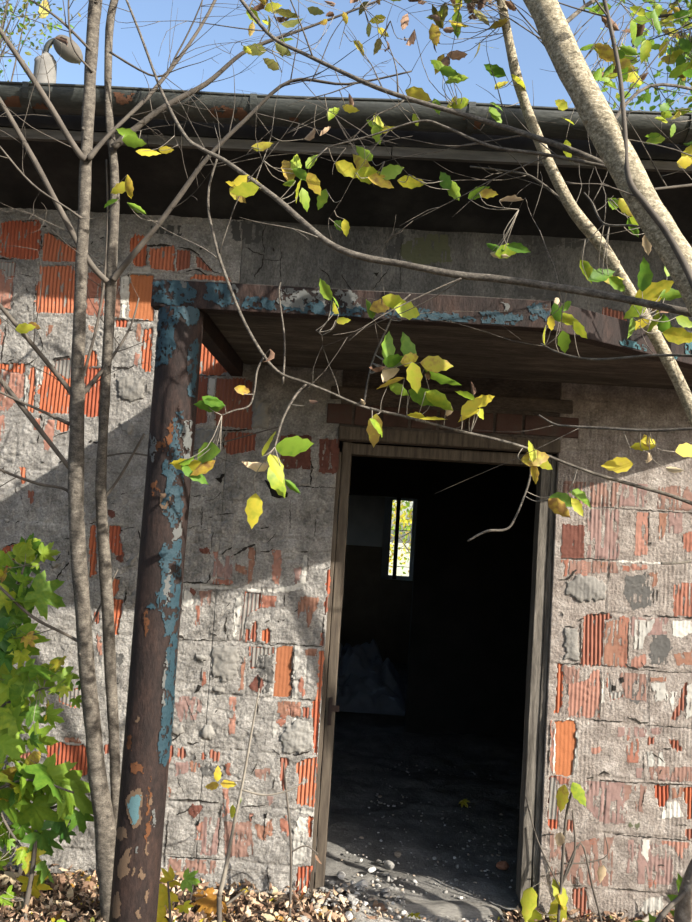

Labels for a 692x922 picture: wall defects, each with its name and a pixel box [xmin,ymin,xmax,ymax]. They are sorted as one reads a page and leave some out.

spalling [0,219,76,314]
peeling [115,233,367,372]
peeling [413,302,550,325]
spalling [0,358,71,432]
spalling [84,350,101,417]
spalling [19,467,34,504]
spalling [146,339,256,767]
spalling [112,578,123,635]
spalling [239,591,293,697]
spalling [579,613,623,702]
spalling [671,682,687,720]
peeling [116,788,156,919]